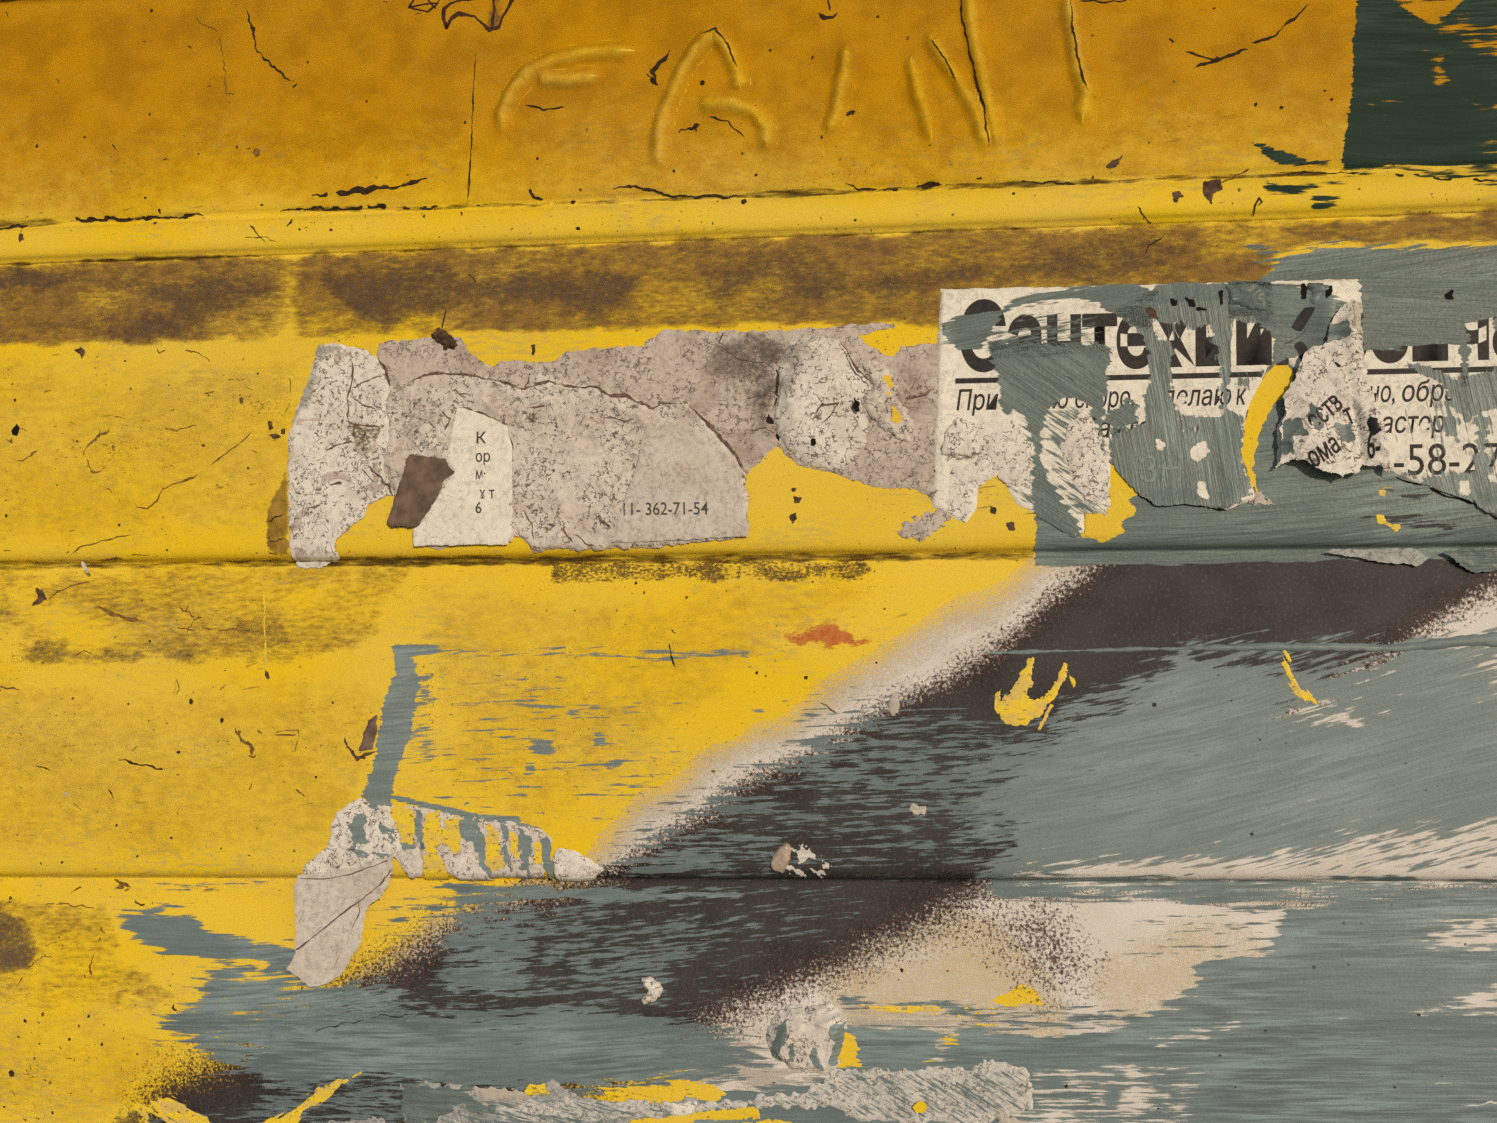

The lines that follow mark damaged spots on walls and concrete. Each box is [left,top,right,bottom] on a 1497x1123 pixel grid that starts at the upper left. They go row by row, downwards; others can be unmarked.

peeling [1241,363,1293,501]
peeling [789,488,802,524]
peeling [1084,491,1136,539]
peeling [1376,515,1401,532]
peeling [641,976,663,1005]
peeling [855,984,1044,1026]
peeling [524,1083,550,1096]
peeling [598,1032,1034,1123]